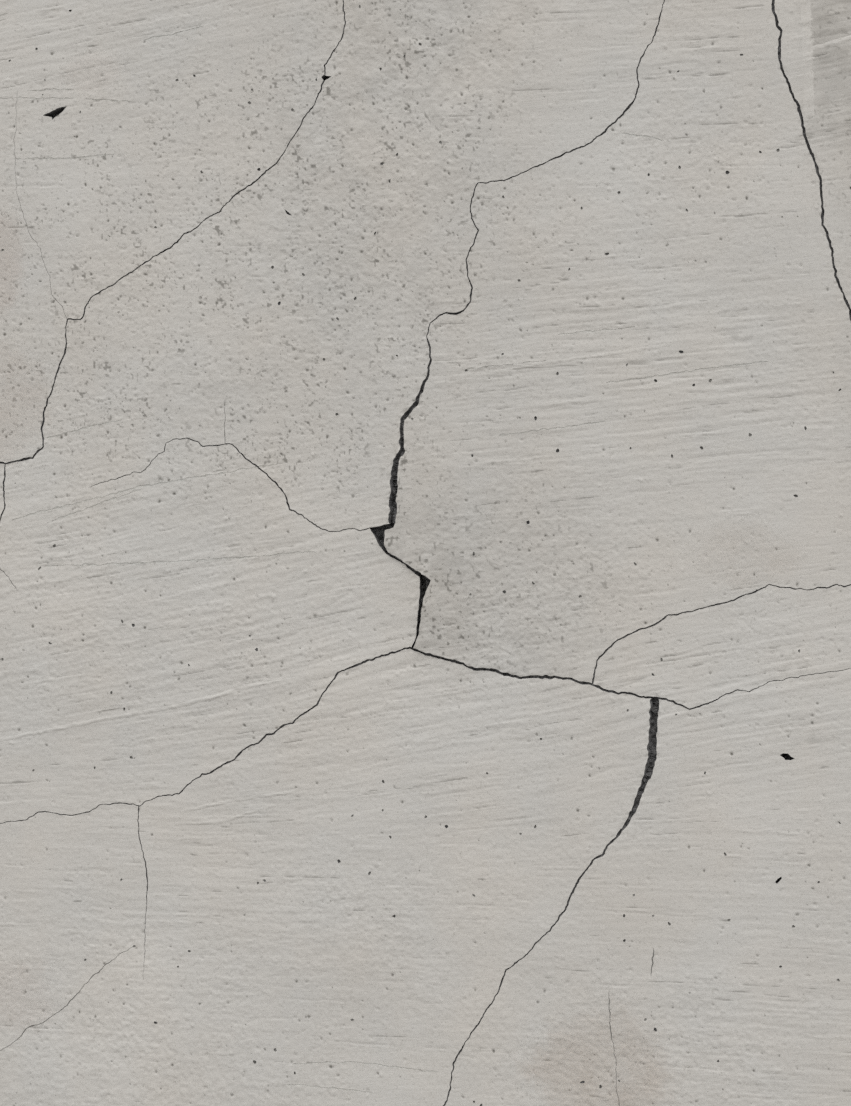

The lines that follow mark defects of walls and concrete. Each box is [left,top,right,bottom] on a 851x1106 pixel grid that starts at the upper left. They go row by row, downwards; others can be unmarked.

crack [0,0,346,520]
crack [137,0,665,647]
crack [771,0,851,321]
crack [0,804,102,824]
crack [0,947,132,1051]
crack [106,584,851,1106]